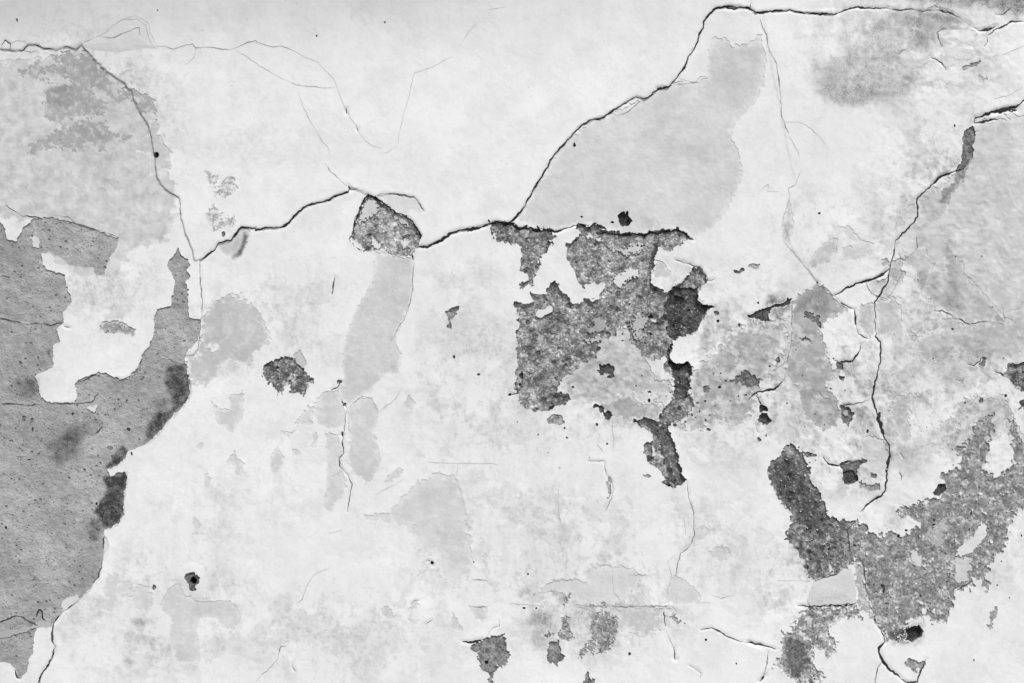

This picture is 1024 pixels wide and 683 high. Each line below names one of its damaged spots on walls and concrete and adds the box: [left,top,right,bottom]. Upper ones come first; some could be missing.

crack [0,373,98,418]
spalling [0,49,425,678]
crack [332,381,403,533]
crack [0,4,1024,380]
crack [588,426,614,511]
peeling [488,34,854,489]
crack [746,303,793,431]
crack [778,166,965,683]
peeling [767,109,1024,683]
spalling [470,633,511,683]